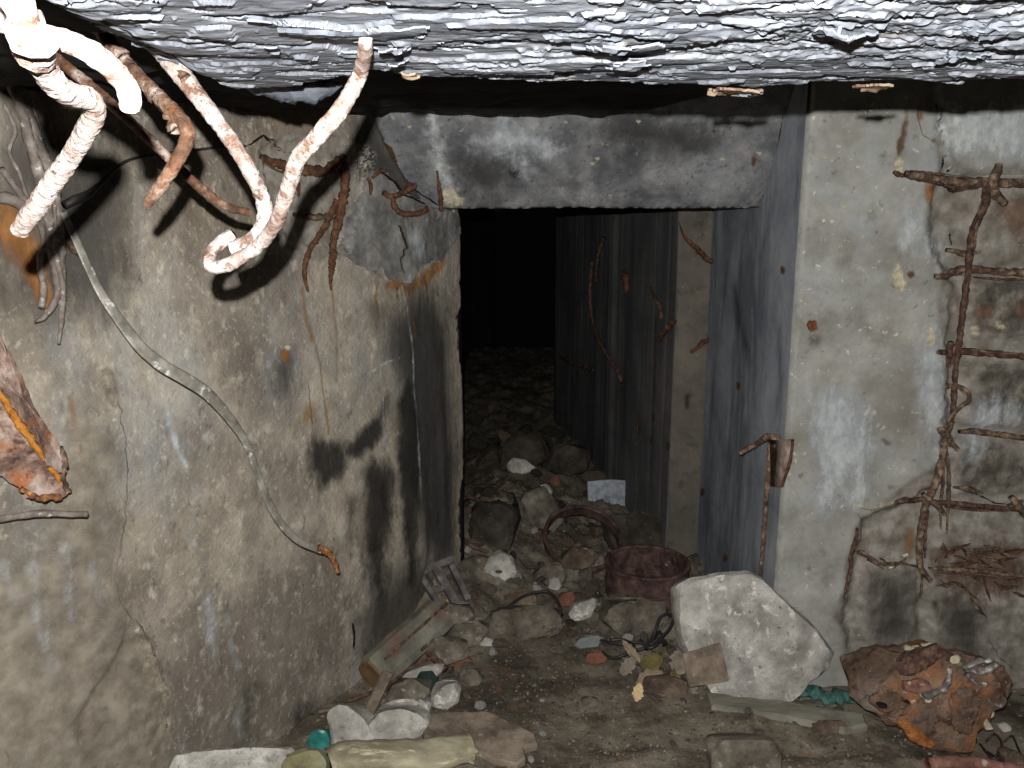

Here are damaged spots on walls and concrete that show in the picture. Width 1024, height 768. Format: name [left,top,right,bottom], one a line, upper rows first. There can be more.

corrosion [104,39,132,62]
corrosion [176,66,191,83]
corrosion [162,111,180,135]
spalling [247,134,307,208]
spalling [275,136,461,283]
corrosion [894,121,990,250]
corrosion [0,204,50,307]
corrosion [387,257,445,301]
corrosion [954,267,1024,329]
spalling [836,104,1024,689]